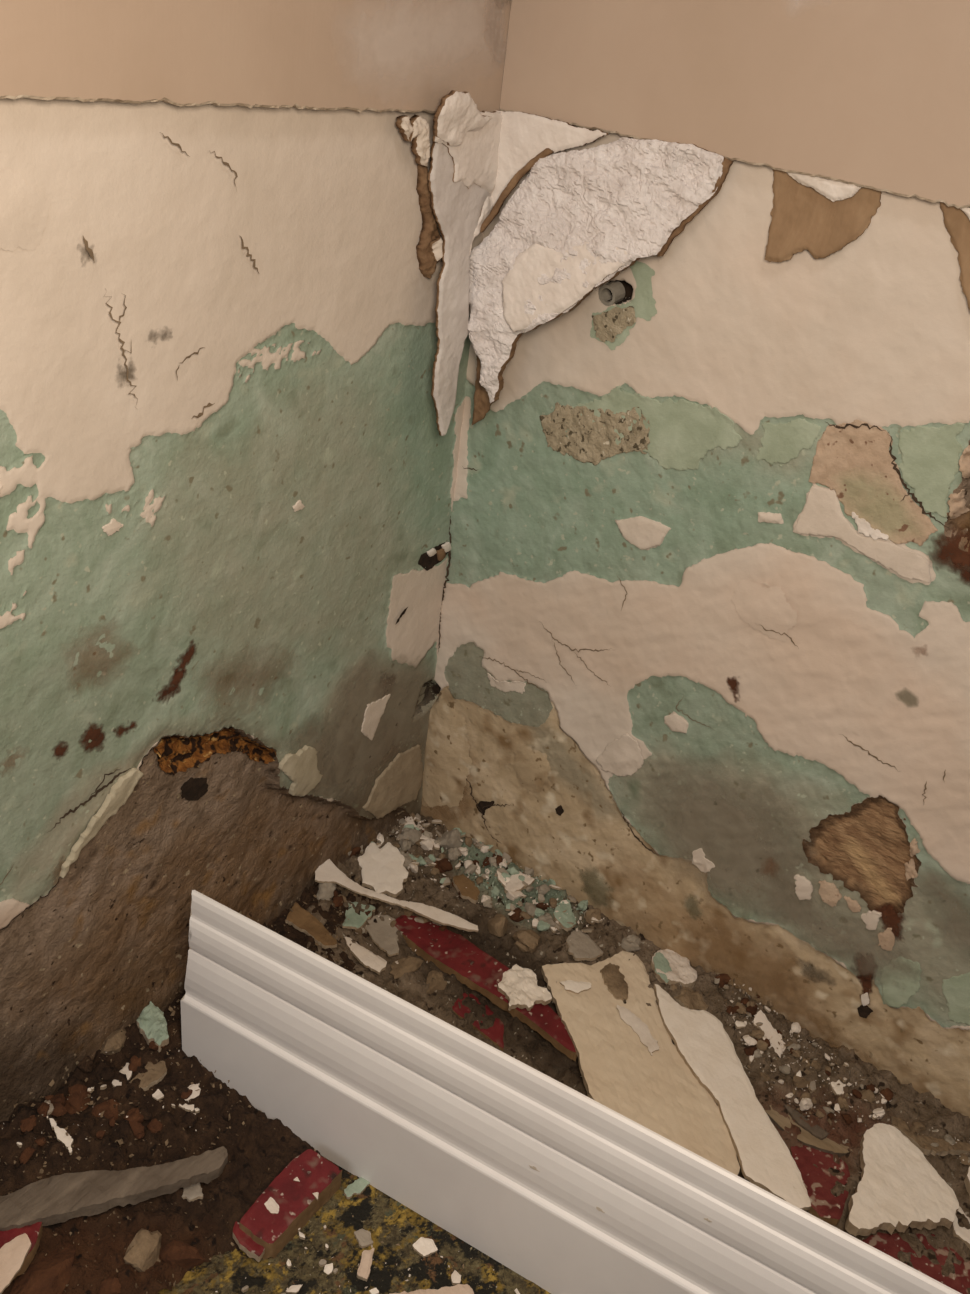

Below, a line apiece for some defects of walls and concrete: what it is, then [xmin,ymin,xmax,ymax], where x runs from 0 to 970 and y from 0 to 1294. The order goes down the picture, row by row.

peeling [0,90,970,1122]
rust [158,641,195,701]
crack [482,624,613,697]
rust [54,722,136,757]
flaking render [47,1116,73,1155]
flaking render [182,1182,203,1202]
flaking render [344,1177,370,1199]